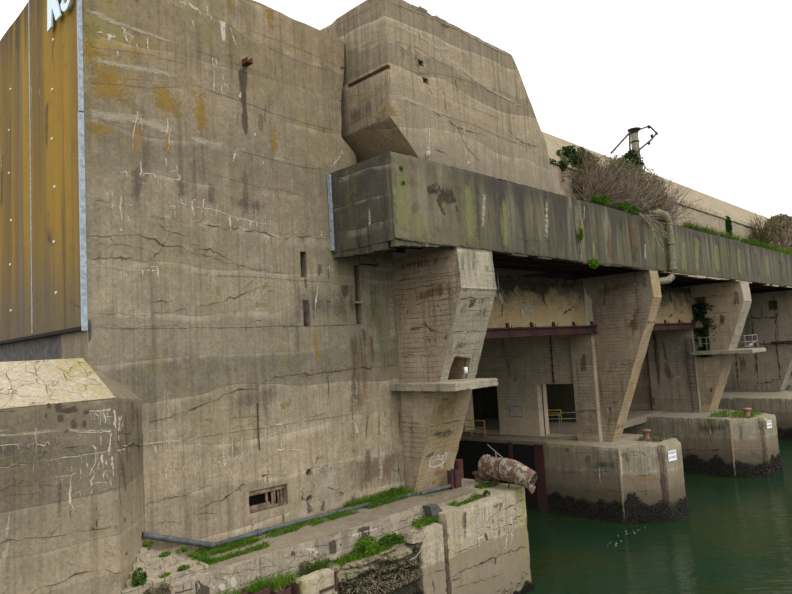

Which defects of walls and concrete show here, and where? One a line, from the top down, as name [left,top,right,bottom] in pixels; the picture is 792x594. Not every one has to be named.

water stain [238,69,266,136]
crack [92,187,383,338]
water stain [456,186,486,244]
crack [150,278,488,429]
crack [711,291,792,390]
crack [0,360,93,500]
crack [0,488,128,594]
crack [145,480,244,528]
crack [151,511,424,590]
crack [419,497,525,594]